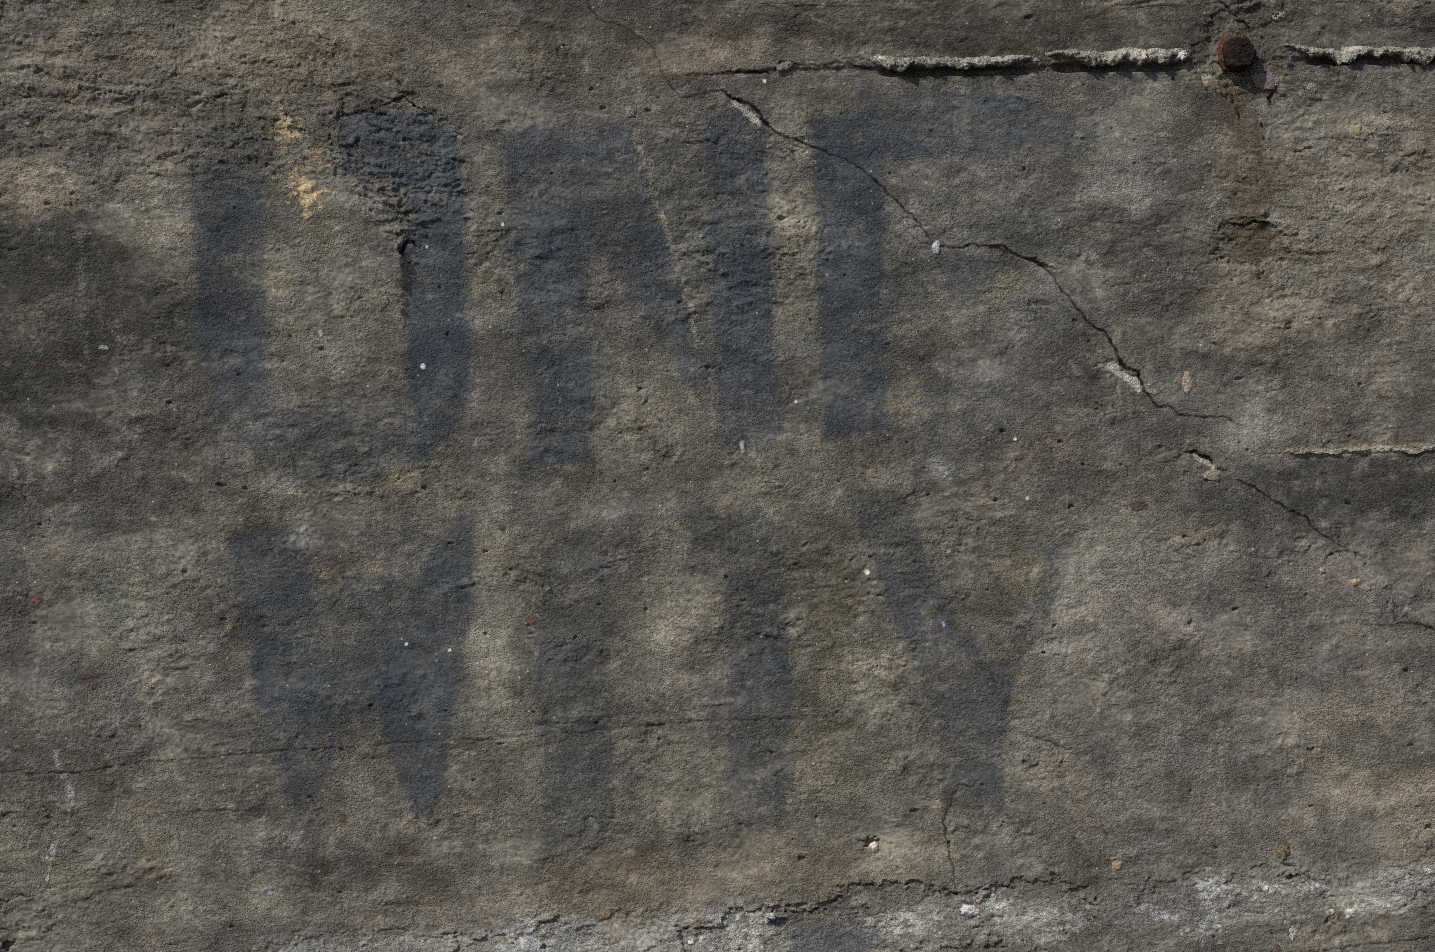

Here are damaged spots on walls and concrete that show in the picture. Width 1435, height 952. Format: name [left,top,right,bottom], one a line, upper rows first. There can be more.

crack [1218,0,1250,28]
crack [669,60,868,156]
crack [1237,92,1273,139]
crack [1222,220,1269,241]
crack [964,244,1349,557]
damp [496,911,580,952]
damp [682,902,778,952]
damp [848,895,947,937]
damp [977,886,1089,938]
damp [1133,867,1392,946]